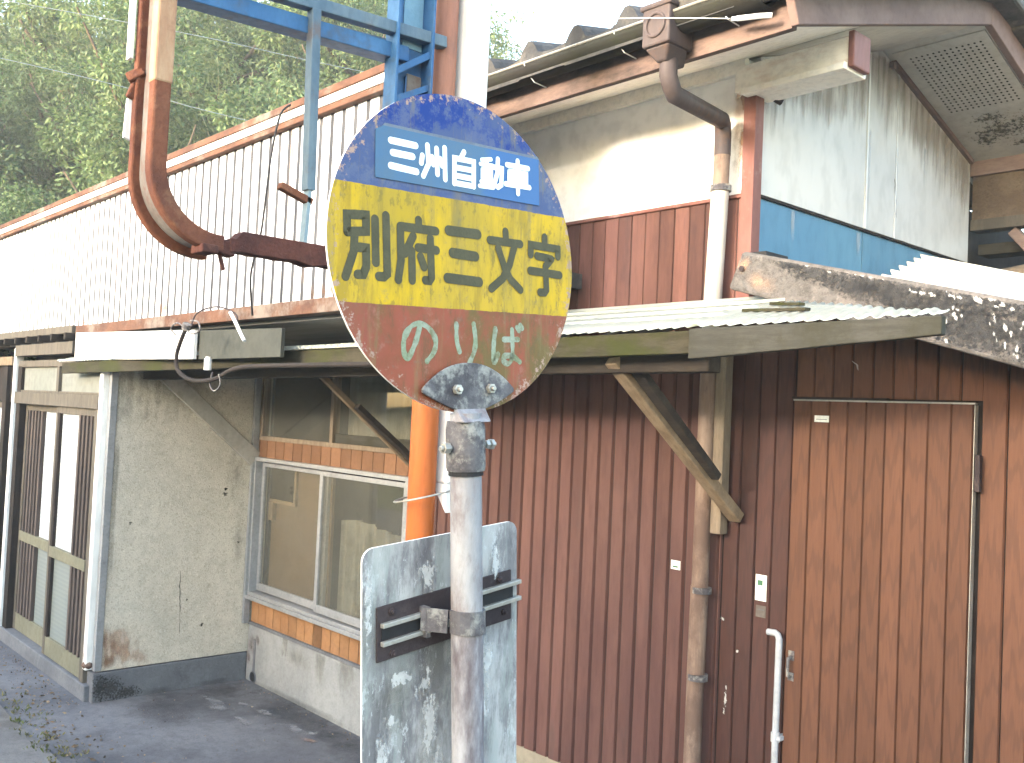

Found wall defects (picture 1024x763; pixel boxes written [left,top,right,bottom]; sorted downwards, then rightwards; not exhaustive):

leakage [971,109,1024,145]
leakage [777,261,1024,363]